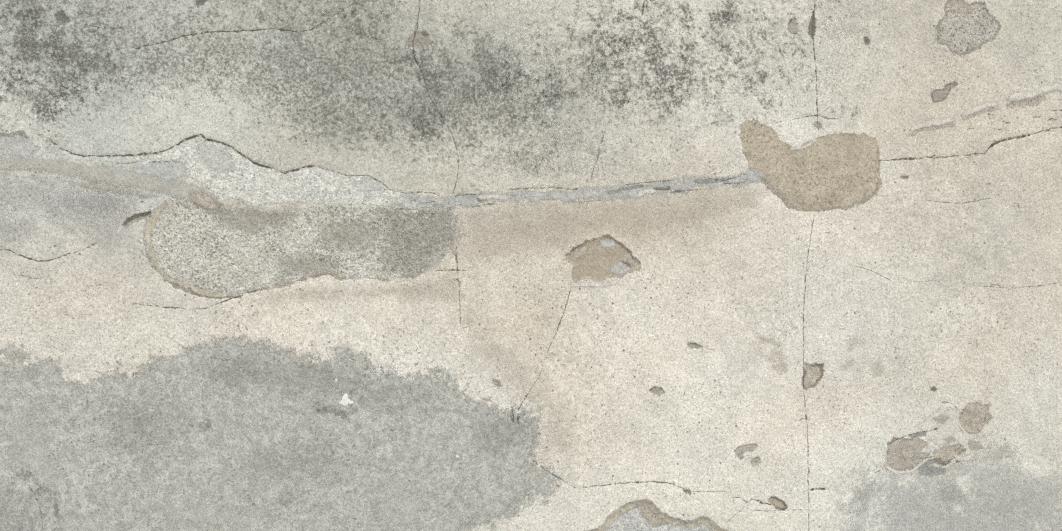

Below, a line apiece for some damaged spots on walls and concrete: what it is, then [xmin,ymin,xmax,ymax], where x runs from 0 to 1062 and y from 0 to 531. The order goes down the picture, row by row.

leakage [0,2,119,121]
leakage [391,49,452,93]
leakage [463,32,530,136]
leakage [548,0,766,121]
spalling [740,120,882,212]
crack [873,109,1062,161]
spalling [123,135,494,299]
spalling [565,235,641,287]
leakage [0,336,562,531]
crack [534,461,688,491]
spalling [588,499,728,531]
peeling [885,402,992,477]